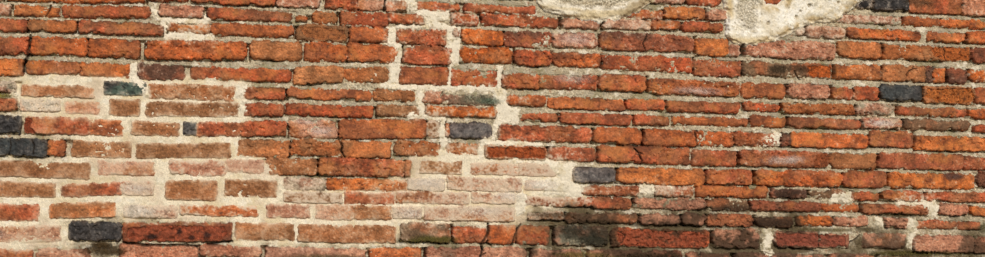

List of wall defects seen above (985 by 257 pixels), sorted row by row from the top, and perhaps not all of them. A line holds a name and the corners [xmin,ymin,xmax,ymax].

peeling [536,0,655,24]
peeling [722,0,863,47]